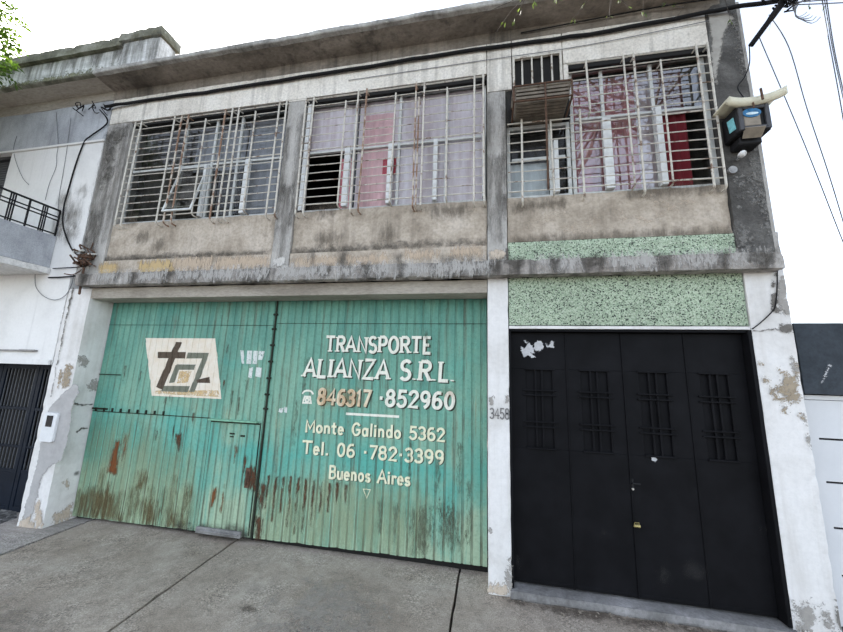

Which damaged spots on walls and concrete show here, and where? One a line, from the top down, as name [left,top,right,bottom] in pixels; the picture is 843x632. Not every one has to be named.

damp [291,229,421,275]
damp [486,256,525,276]
peeling [57,355,90,389]
peeling [521,340,554,358]
peeling [759,355,812,450]
corrosion [75,436,192,528]
corrosion [234,447,348,540]